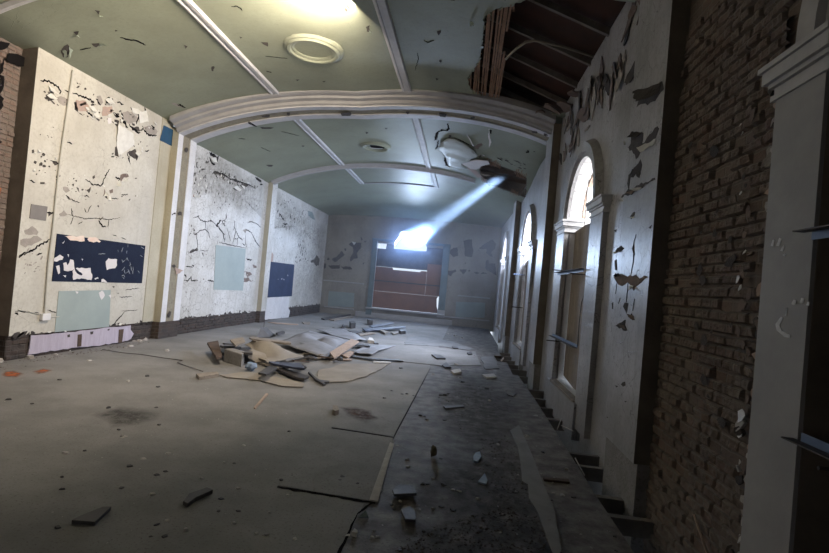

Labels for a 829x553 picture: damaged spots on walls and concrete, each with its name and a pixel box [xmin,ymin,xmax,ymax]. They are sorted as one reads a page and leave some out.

crack [0,59,8,143]
flaking render [0,41,25,67]
peeling [61,43,106,58]
flaking render [559,0,664,165]
peeling [30,79,158,203]
flaking render [462,130,526,178]
peeling [618,126,659,201]
crack [68,205,126,240]
crack [190,216,260,249]
peeling [611,246,647,291]
crack [333,369,430,438]
crack [277,486,375,553]